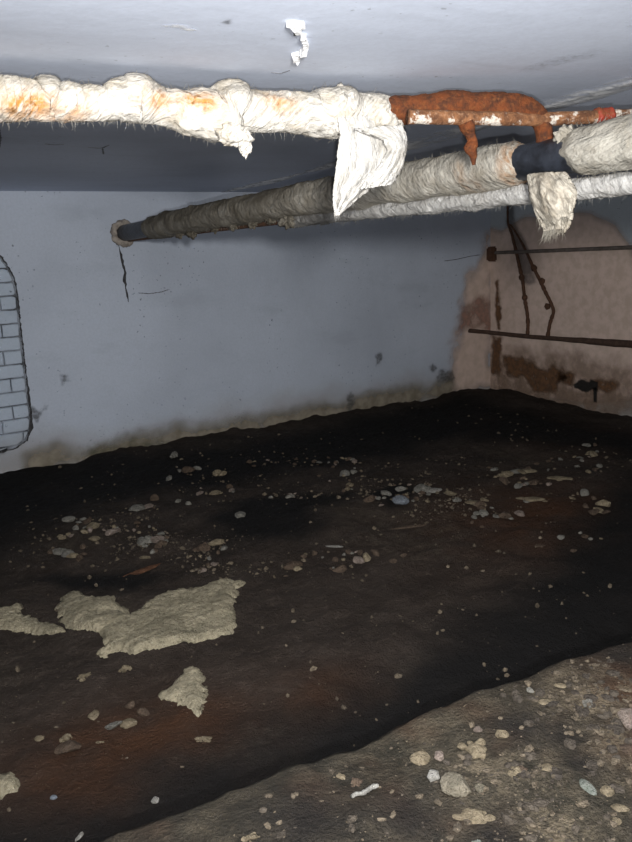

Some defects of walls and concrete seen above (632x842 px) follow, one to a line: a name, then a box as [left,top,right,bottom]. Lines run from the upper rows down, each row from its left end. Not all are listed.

crack [118,245,167,302]
peeling [432,213,632,403]
damp [26,379,454,468]